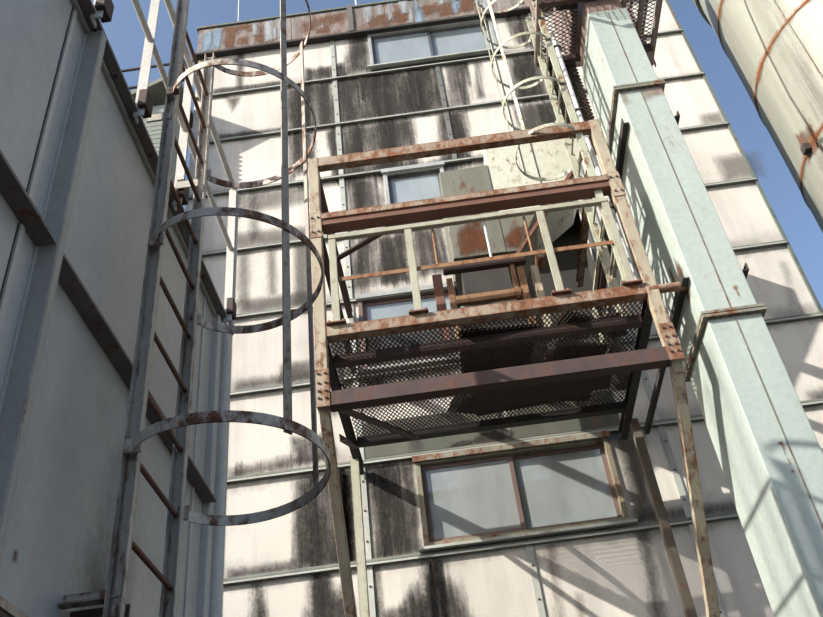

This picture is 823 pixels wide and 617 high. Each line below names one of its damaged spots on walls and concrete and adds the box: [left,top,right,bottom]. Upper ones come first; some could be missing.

rust [224,24,264,48]
water stain [213,37,484,181]
rust [368,0,474,27]
water stain [505,14,557,129]
rust [754,16,792,116]
rust [796,126,820,198]
rust [458,214,488,256]
rust [505,226,525,247]
water stain [228,477,345,617]
water stain [339,470,356,562]
water stain [365,461,420,558]
water stain [373,558,468,617]